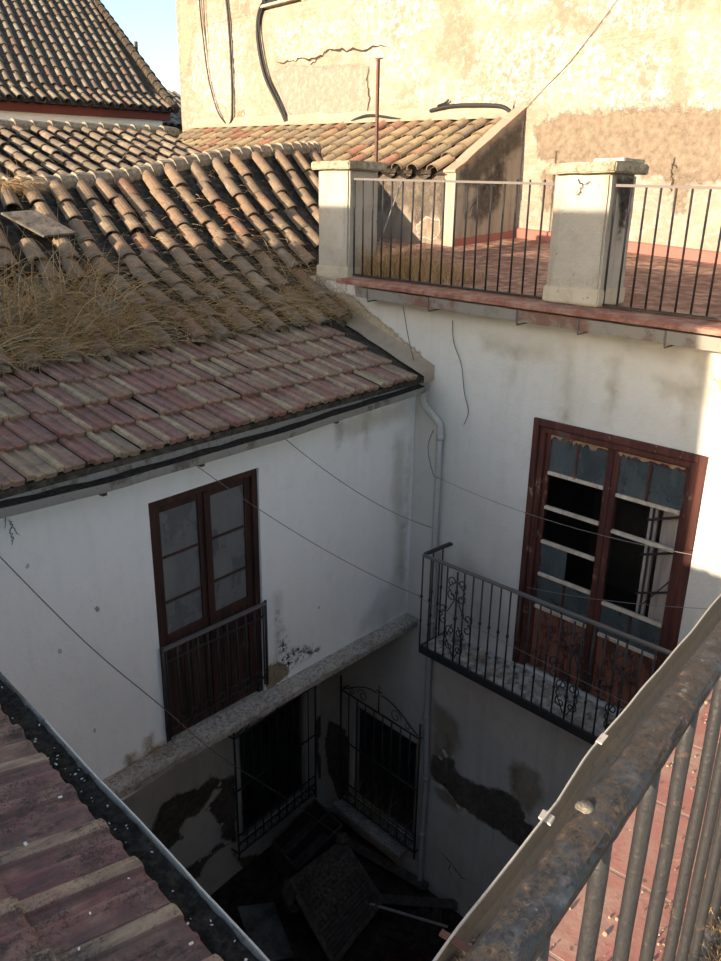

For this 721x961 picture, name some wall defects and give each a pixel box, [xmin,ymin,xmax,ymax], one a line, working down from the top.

crack [278,45,387,111]
peeling [149,774,238,882]
peeling [429,749,535,847]